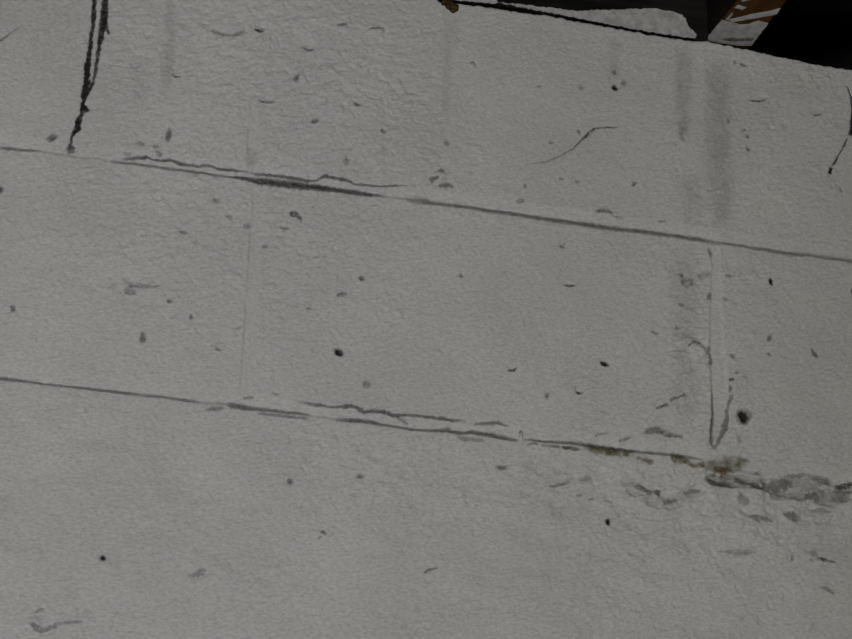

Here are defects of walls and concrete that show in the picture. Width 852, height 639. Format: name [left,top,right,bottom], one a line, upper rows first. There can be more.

crack [68,0,109,150]
crack [828,89,852,174]
crack [217,168,372,197]
crack [339,405,452,432]